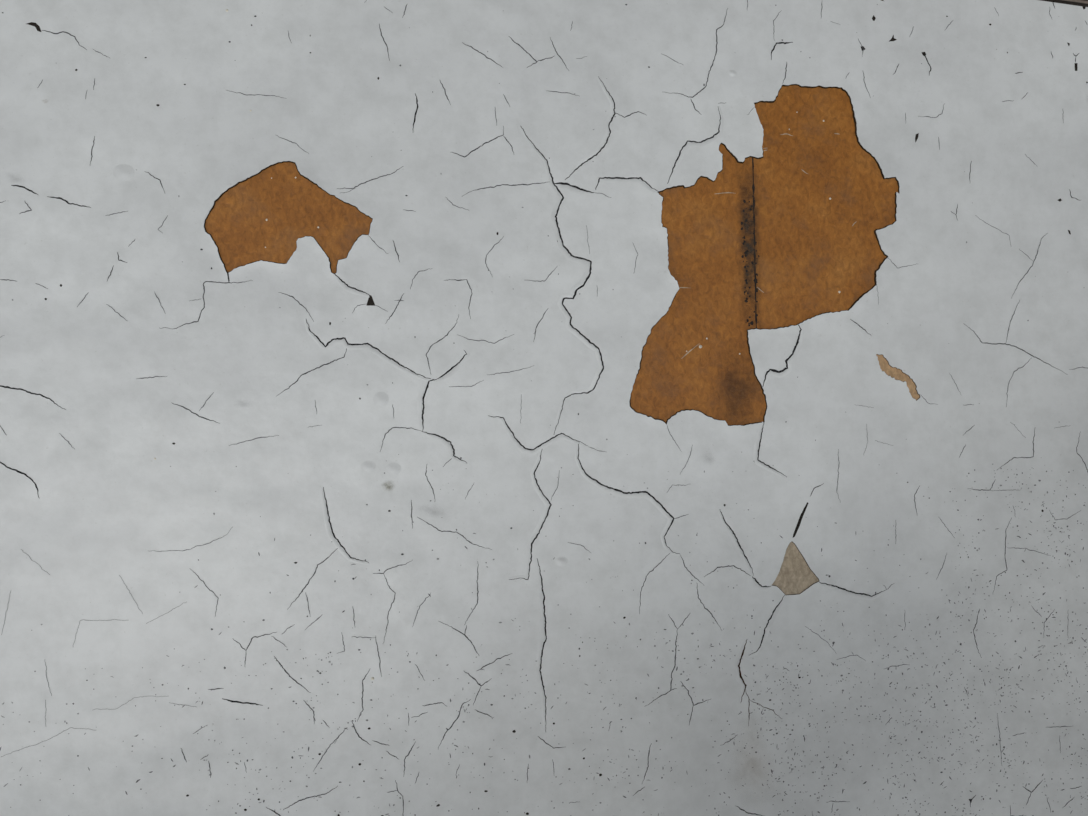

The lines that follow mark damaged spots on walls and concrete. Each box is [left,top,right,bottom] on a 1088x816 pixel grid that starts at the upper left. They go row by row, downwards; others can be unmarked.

crack [0,185,127,216]
crack [155,272,253,329]
peeling [204,161,373,274]
peeling [629,84,899,426]
crack [0,385,72,447]
crack [233,0,787,816]
crack [763,324,804,388]
peeling [876,354,920,400]
crack [952,205,1088,658]
crack [0,462,39,497]
peeling [772,502,819,595]
crack [2,663,260,778]